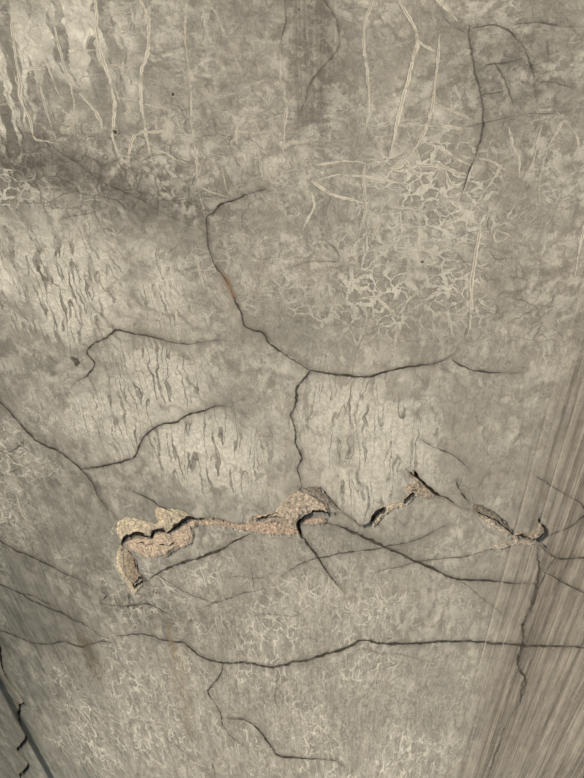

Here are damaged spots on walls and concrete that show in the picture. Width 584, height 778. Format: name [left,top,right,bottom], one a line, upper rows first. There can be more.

leakage [0,0,229,216]
leakage [303,0,542,238]
leakage [466,217,496,338]
crack [71,329,201,387]
crack [206,189,519,490]
crack [0,402,217,516]
spalling [114,487,339,594]
spalling [367,470,452,526]
crack [428,444,469,501]
spalling [472,504,547,549]
crack [0,500,584,777]